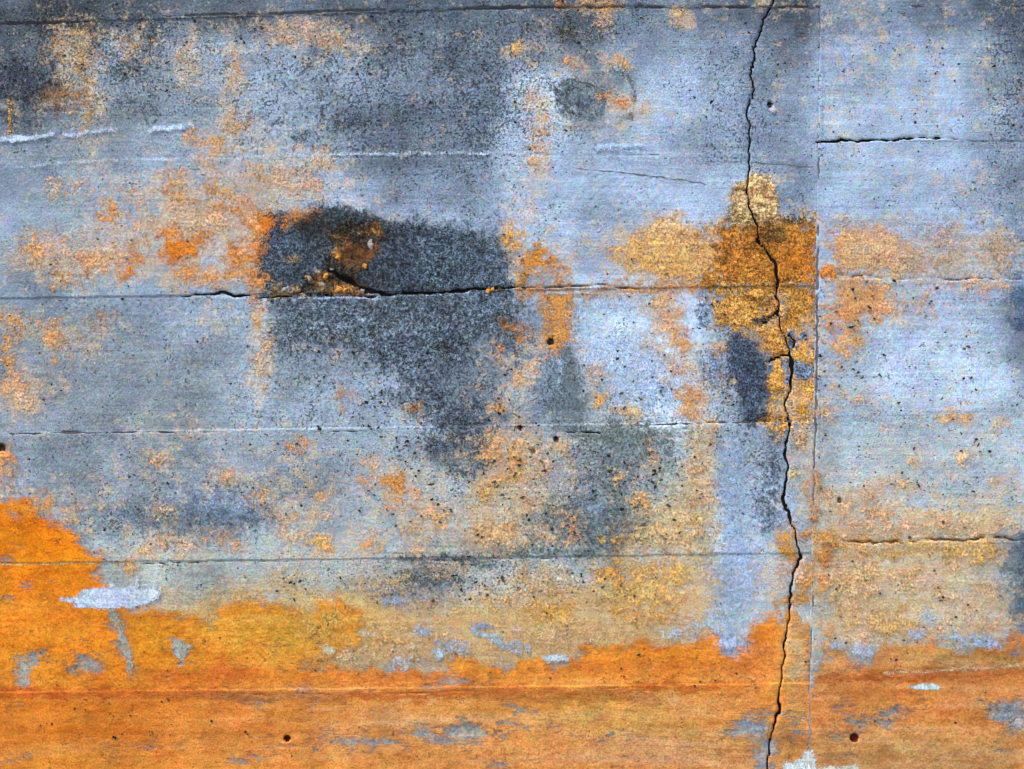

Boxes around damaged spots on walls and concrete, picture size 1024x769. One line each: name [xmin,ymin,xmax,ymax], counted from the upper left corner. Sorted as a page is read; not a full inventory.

rust [17,107,336,331]
crack [181,269,525,299]
rust [0,172,1024,769]
leakage [253,202,814,659]
crack [573,0,956,769]
crack [943,275,1020,283]
efflorescence [542,654,569,663]